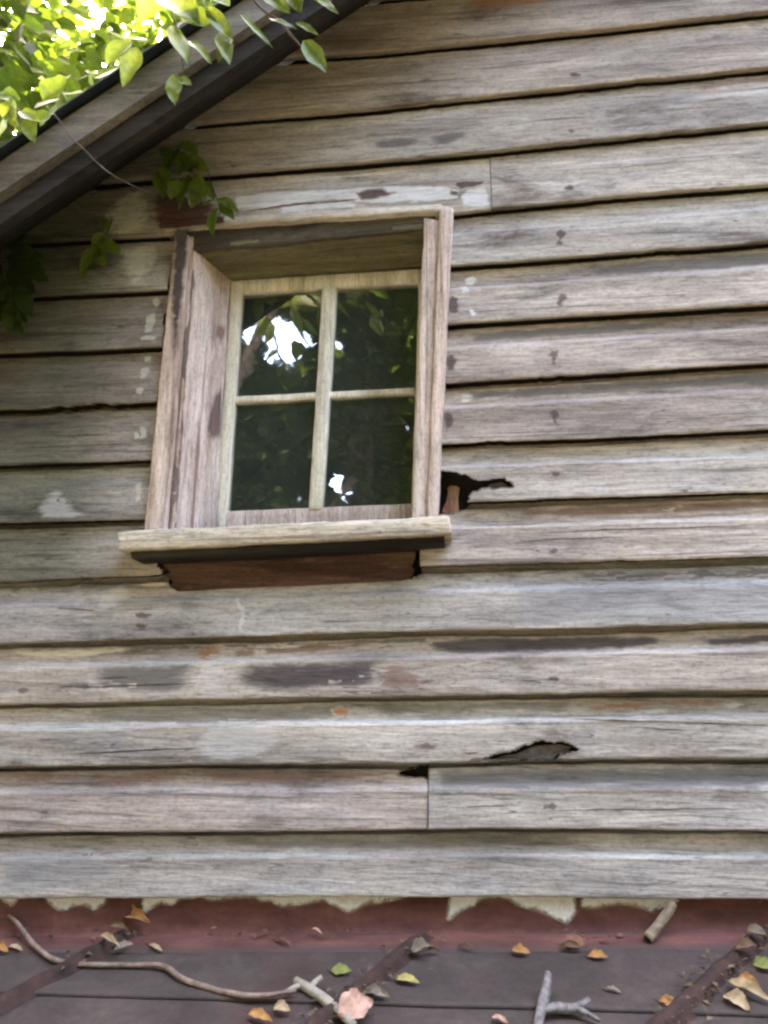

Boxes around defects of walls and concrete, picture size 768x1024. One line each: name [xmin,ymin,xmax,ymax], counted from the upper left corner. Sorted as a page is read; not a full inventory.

damp [223,566,768,718]
damp [55,644,210,701]
peeling [46,897,105,909]
peeling [142,898,180,912]
peeling [255,896,402,911]
peeling [448,896,678,923]